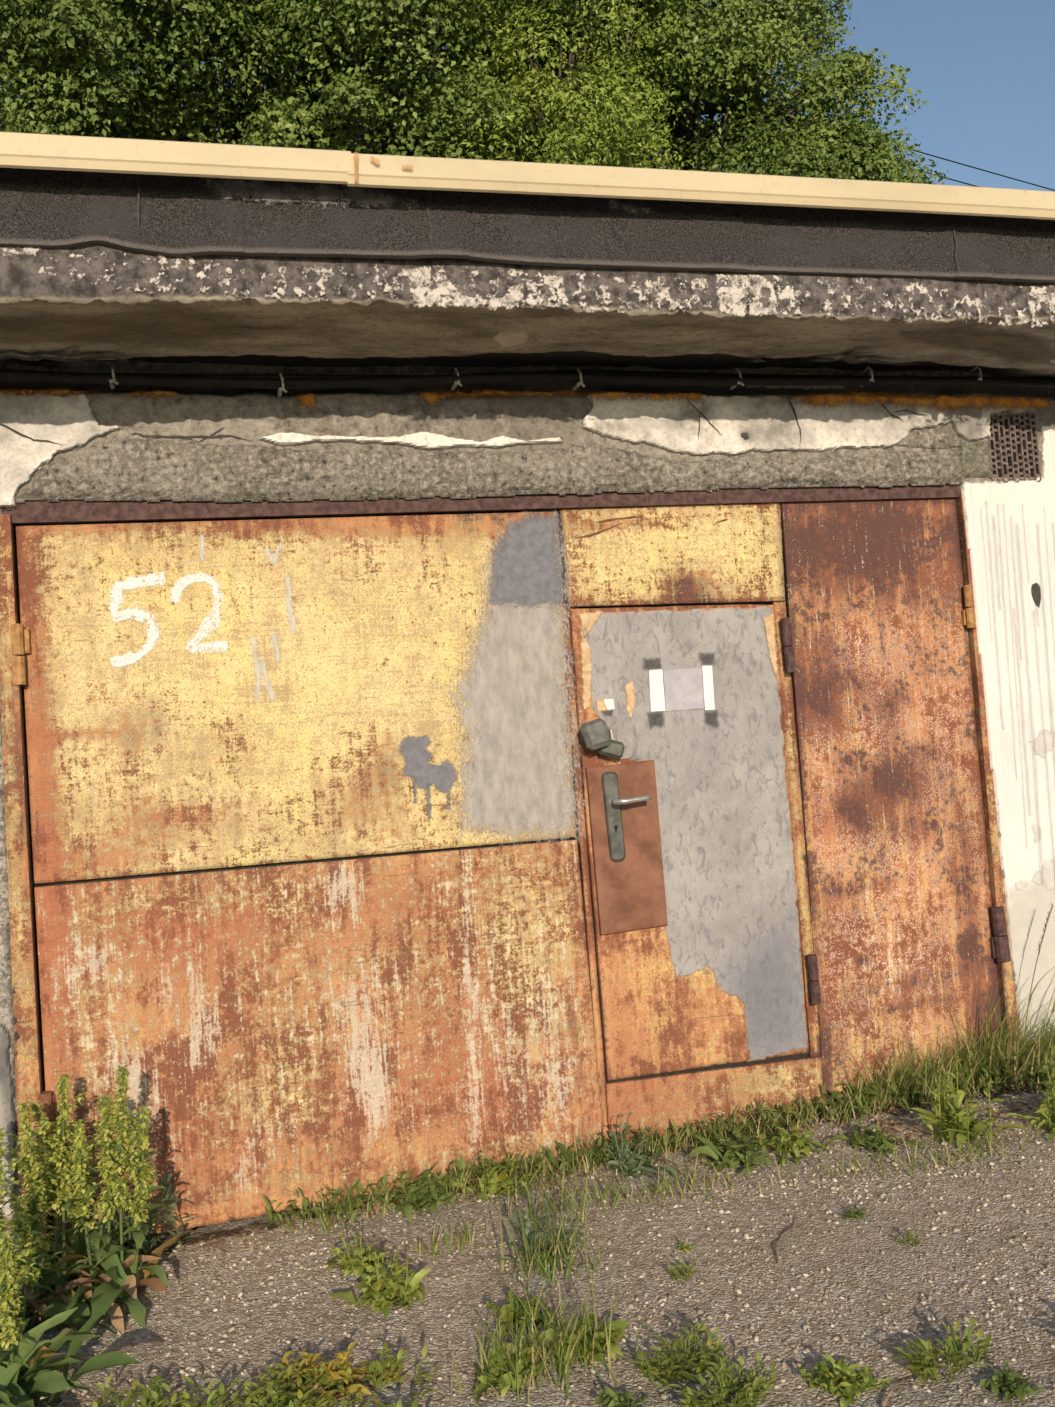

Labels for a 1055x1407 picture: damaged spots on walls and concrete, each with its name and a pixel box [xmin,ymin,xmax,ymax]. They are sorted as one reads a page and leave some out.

corrosion [420,389,704,406]
flaking render [581,368,1035,456]
corrosion [796,390,1050,412]
flaking render [0,392,123,510]
flaking render [257,431,563,450]
peeling [1028,729,1055,759]
peeling [1031,824,1042,843]
peeling [1015,858,1055,891]
flaking render [0,1024,18,1217]